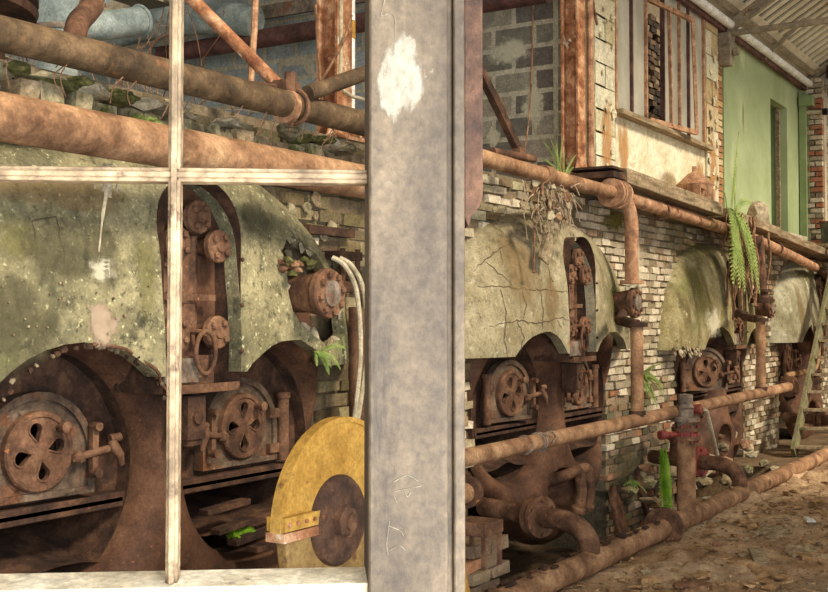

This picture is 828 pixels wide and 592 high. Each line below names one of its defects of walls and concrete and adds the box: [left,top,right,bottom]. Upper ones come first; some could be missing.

corrosion [603,109,628,168]
water stain [0,183,92,203]
water stain [27,228,116,280]
water stain [0,279,55,355]
crack [473,246,567,356]
water stain [707,266,726,337]